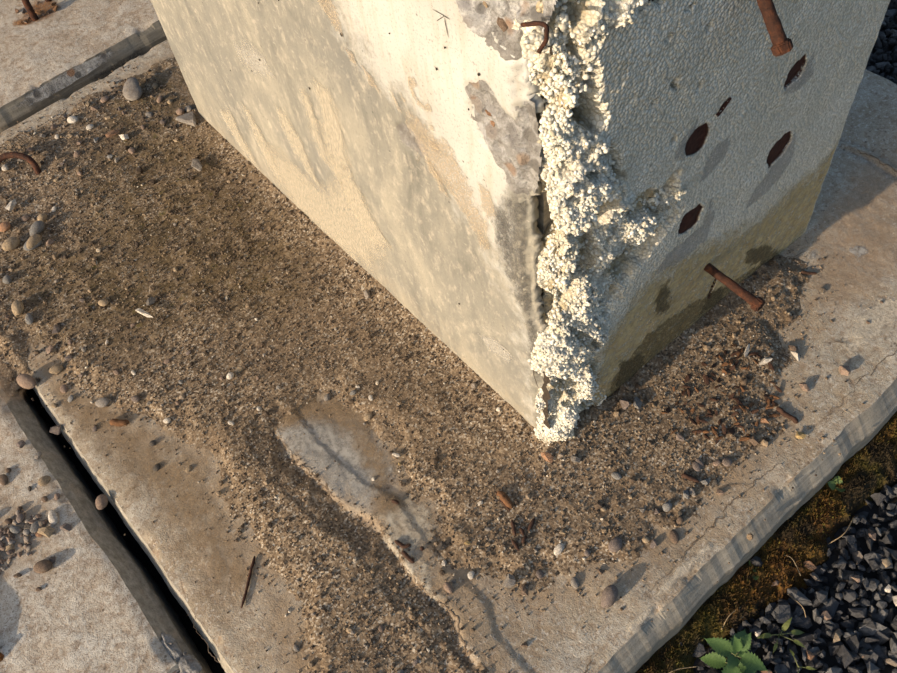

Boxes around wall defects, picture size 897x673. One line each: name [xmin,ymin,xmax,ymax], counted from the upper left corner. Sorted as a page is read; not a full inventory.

rust [14,1,56,25]
spalling [455,0,558,61]
spalling [465,73,542,198]
damp [495,198,532,311]
damp [593,148,836,405]
crack [533,370,551,429]